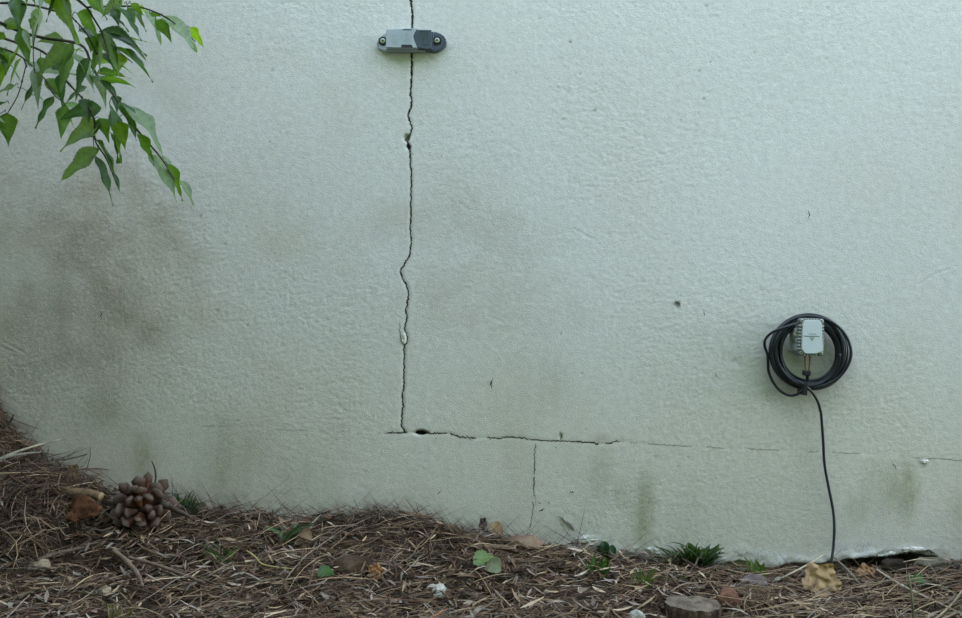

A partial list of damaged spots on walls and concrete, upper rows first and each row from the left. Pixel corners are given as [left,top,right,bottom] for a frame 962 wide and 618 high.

crack [407,0,415,28]
crack [275,53,724,534]